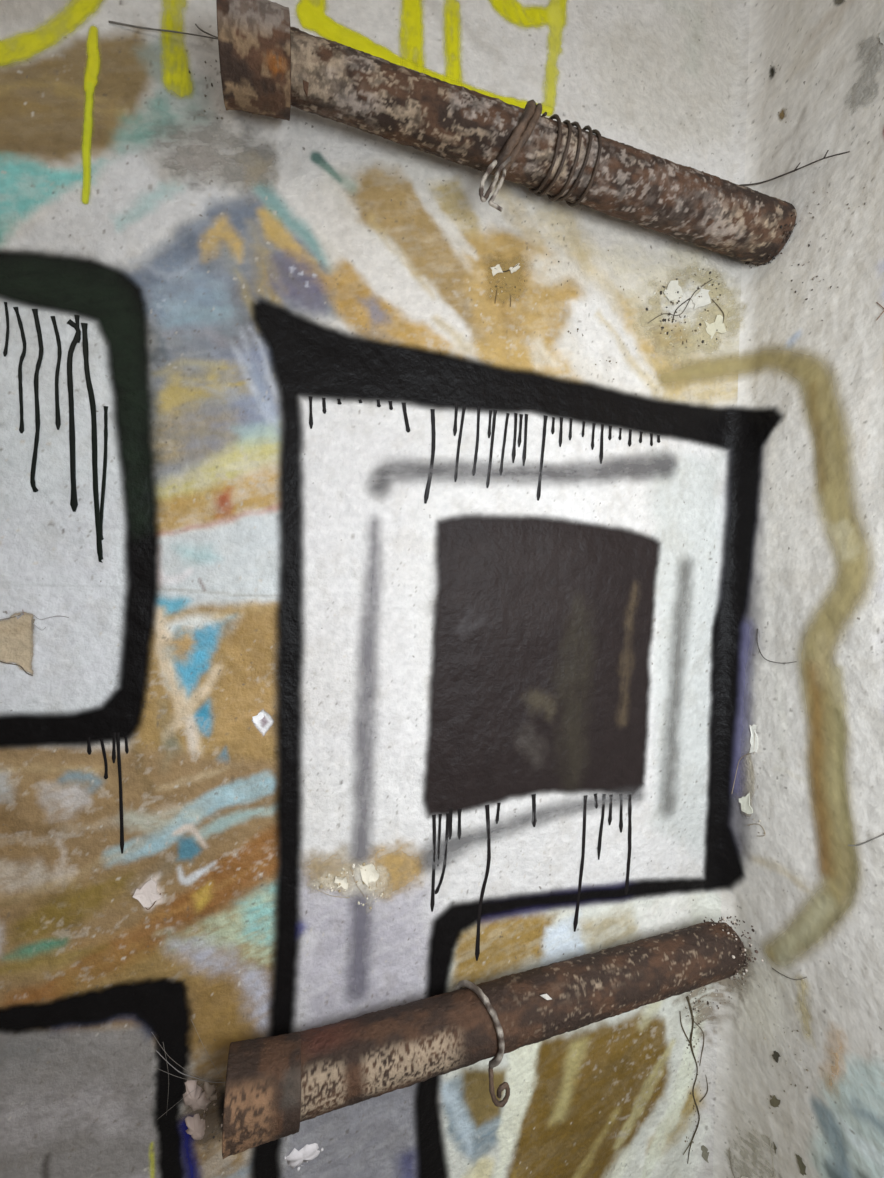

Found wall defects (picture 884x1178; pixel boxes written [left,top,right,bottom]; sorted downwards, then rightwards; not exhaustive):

peeling [0,609,69,676]
spalling [156,1050,226,1144]